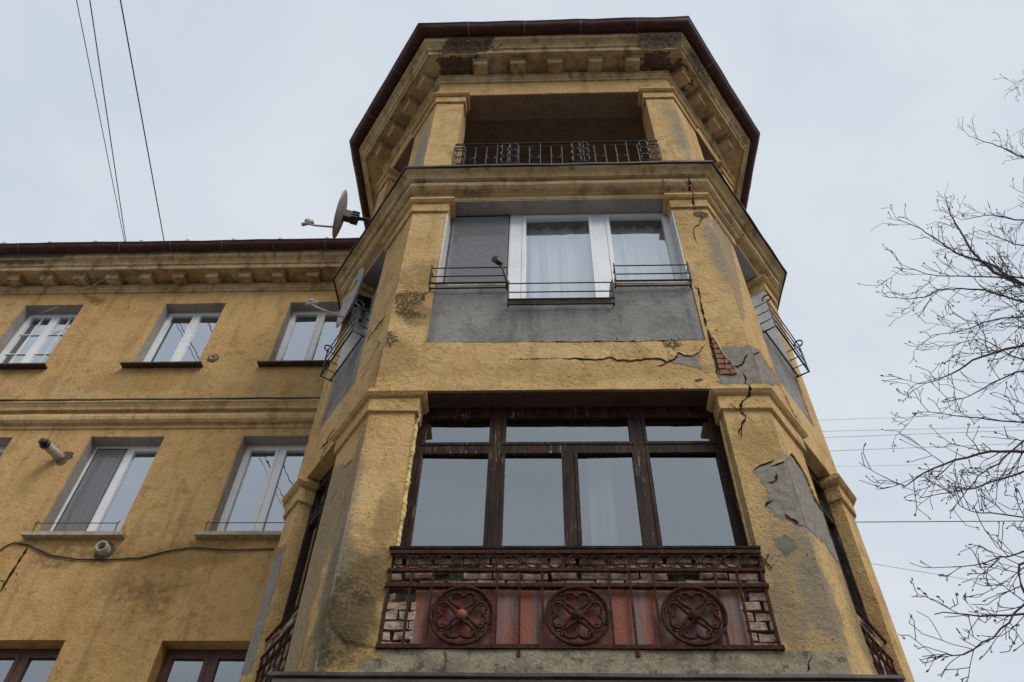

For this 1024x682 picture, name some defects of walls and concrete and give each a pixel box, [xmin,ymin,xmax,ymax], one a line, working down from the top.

crack [661,173,703,242]
flaking render [393,289,429,320]
crack [518,284,710,366]
flaking render [663,328,779,387]
crack [730,348,800,435]
flaking render [752,451,840,565]
crack [0,547,28,592]